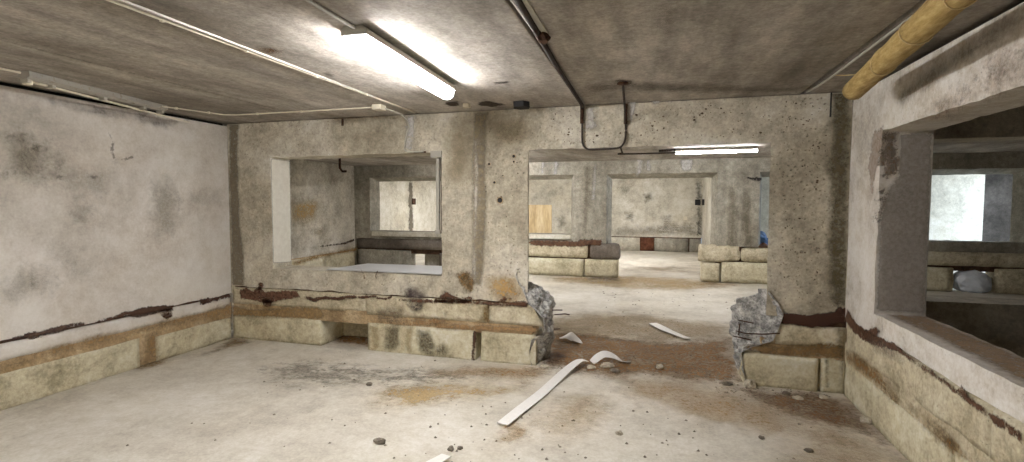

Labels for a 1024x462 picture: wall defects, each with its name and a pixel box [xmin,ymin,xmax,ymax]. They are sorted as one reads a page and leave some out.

leakage [378,289,446,356]
spalling [507,259,570,366]
spalling [729,289,845,380]
corrosion [846,351,896,399]
corrosion [928,423,962,455]